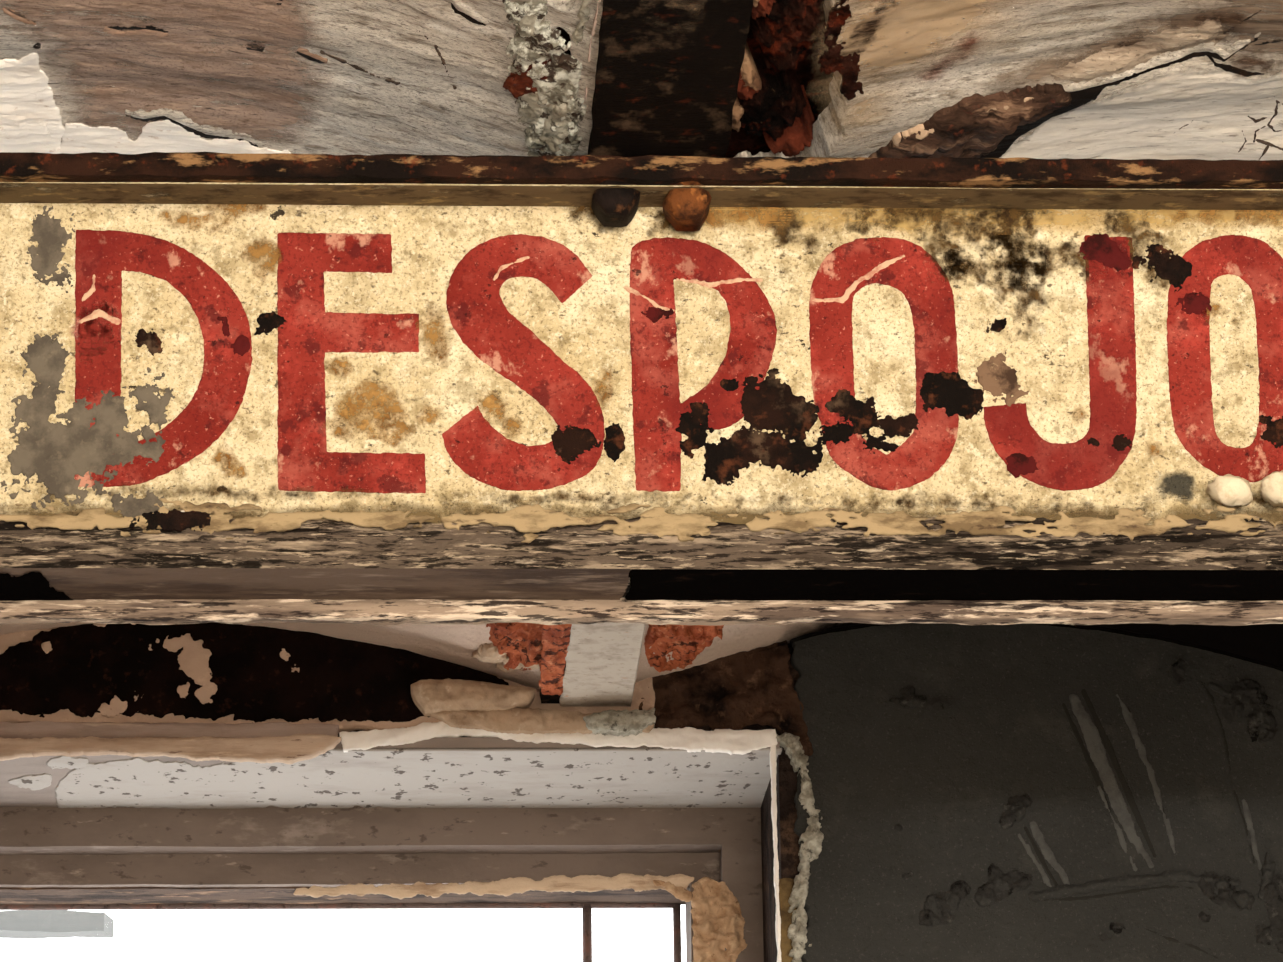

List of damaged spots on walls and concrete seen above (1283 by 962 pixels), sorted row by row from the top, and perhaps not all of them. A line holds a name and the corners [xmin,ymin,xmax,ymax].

peeling [0,43,291,154]
spalling [502,0,591,156]
spalling [732,0,864,157]
damp [999,0,1283,93]
crack [1063,11,1283,160]
peeling [986,318,1007,333]
peeling [675,351,1029,486]
peeling [0,622,824,962]